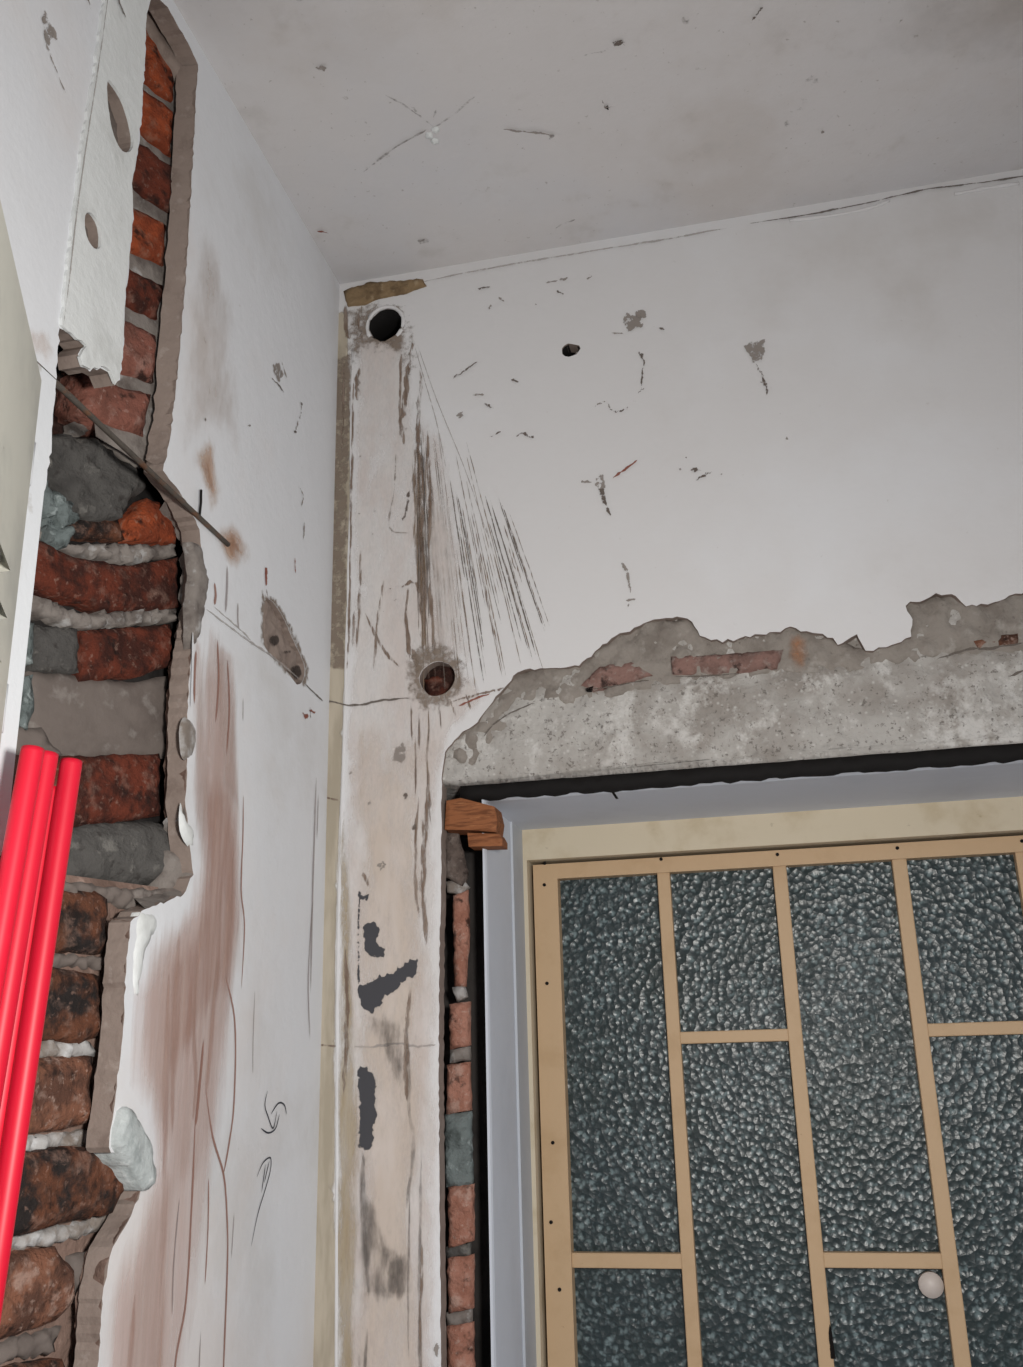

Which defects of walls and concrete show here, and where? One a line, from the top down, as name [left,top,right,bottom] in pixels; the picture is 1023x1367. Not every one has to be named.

spalling [0,11,209,1367]
damp [115,641,245,1367]
spalling [261,568,308,686]
flaking render [303,312,418,1367]
damp [410,352,548,793]
peeling [613,310,646,334]
spalling [453,595,1023,765]
peeling [744,339,768,394]